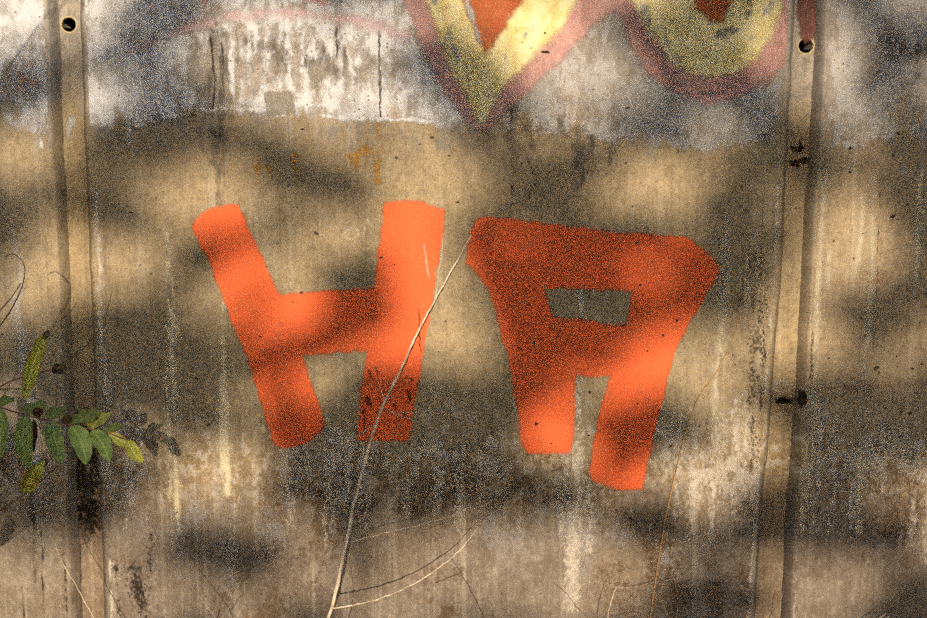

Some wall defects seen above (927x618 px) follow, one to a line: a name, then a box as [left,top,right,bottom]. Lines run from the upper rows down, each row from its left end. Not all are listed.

leakage [574,375,583,433]
leakage [275,426,390,546]
leakage [403,436,508,532]
leakage [556,443,596,611]
leakage [108,534,153,618]